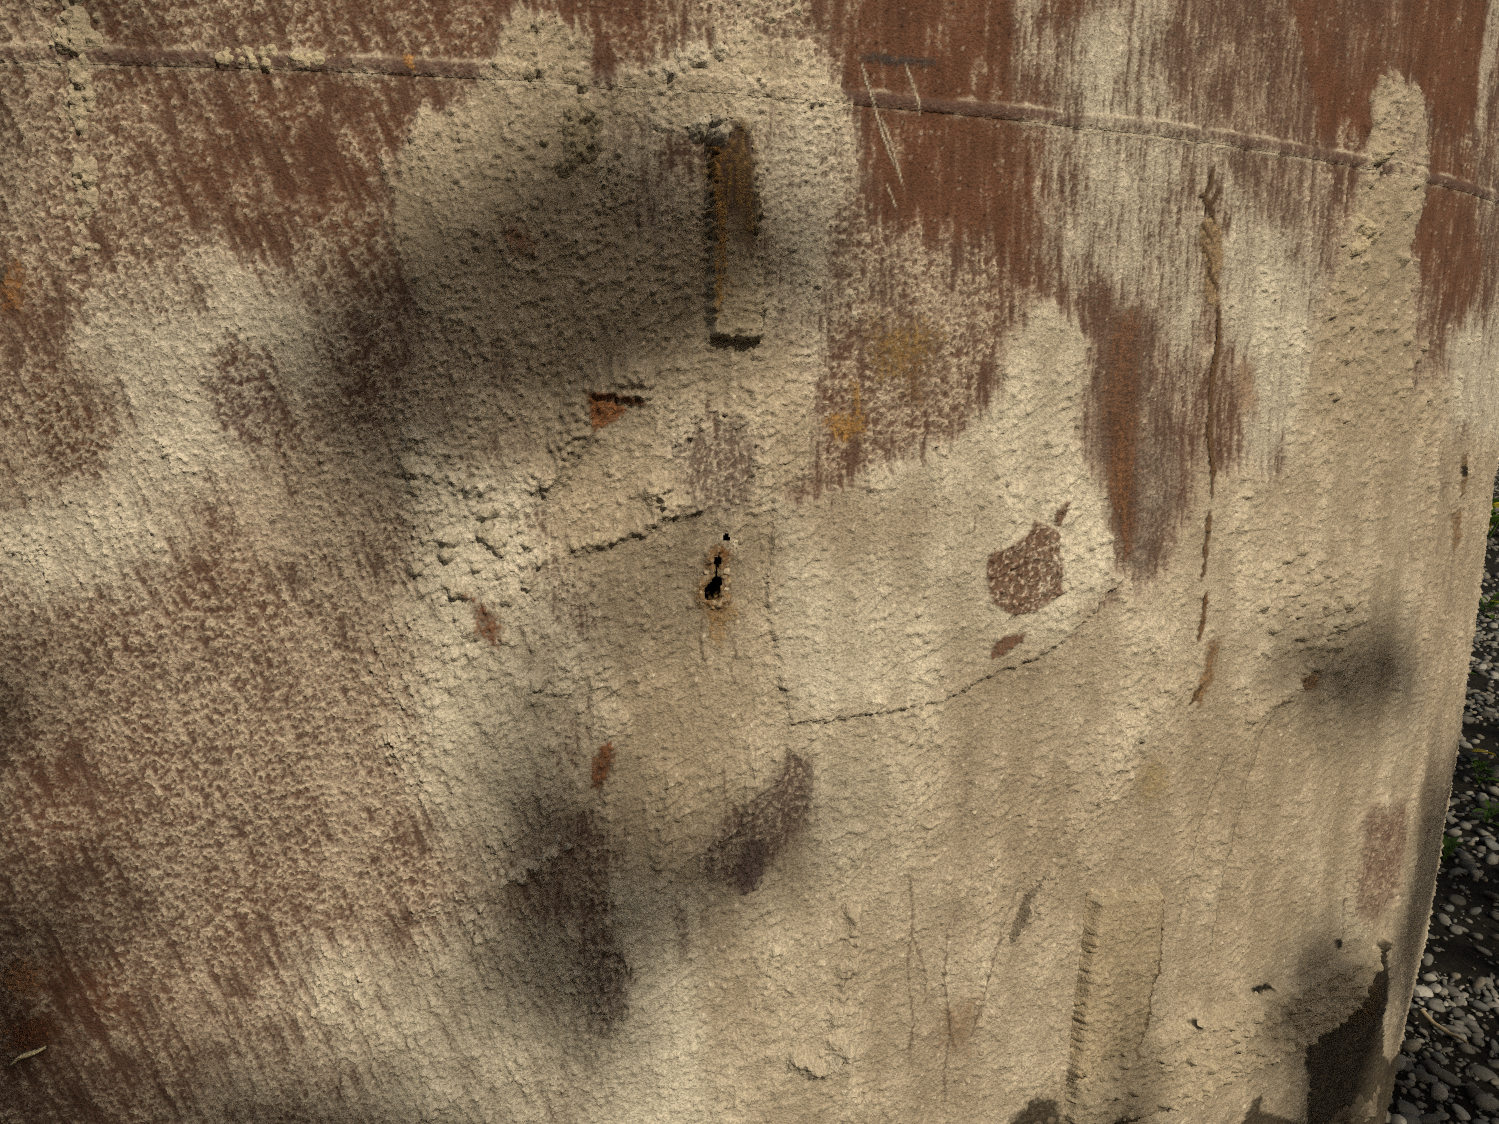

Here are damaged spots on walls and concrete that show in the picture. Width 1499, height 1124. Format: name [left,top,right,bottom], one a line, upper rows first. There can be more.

corrosion [1102,304,1179,576]
corrosion [1452,455,1469,549]